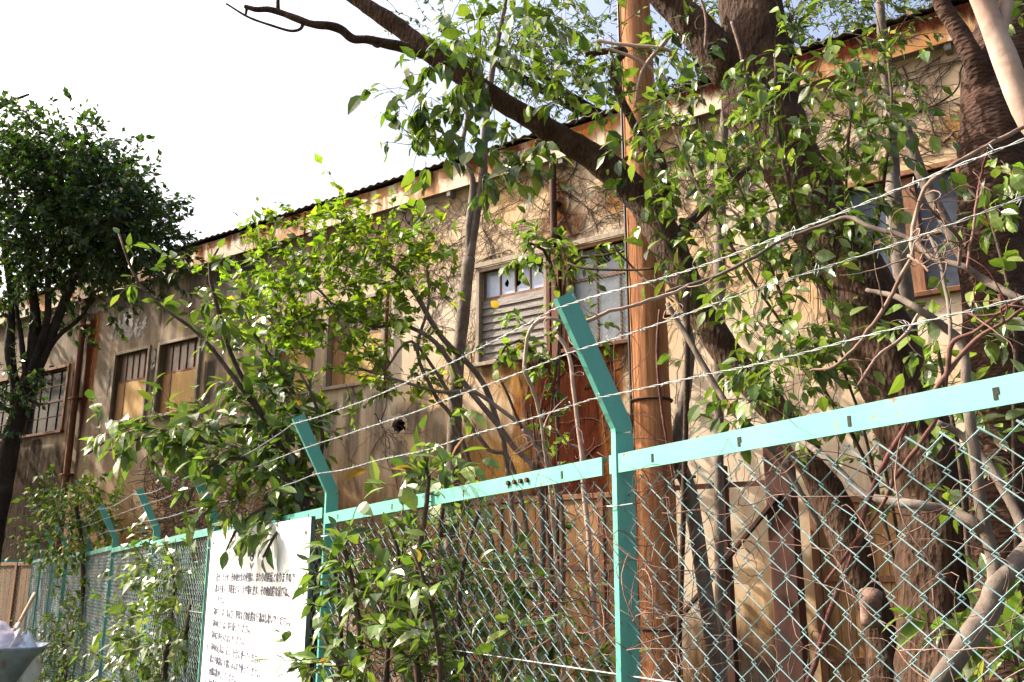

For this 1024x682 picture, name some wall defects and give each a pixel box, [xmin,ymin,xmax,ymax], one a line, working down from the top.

peeling [111,312,148,346]
spalling [391,406,418,437]